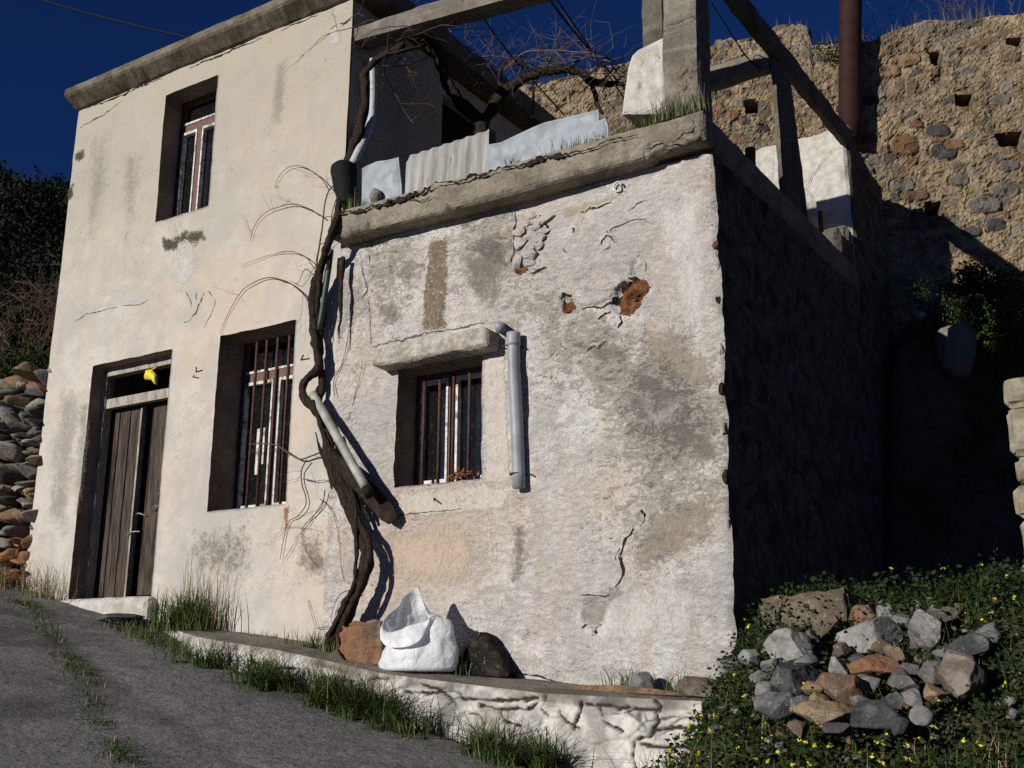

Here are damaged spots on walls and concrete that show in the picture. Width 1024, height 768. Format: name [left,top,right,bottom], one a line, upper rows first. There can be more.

crack [339,117,695,215]
flaking render [510,211,555,275]
damp [422,237,448,330]
flaking render [558,253,652,316]
crack [581,527,634,597]
crack [580,622,602,636]